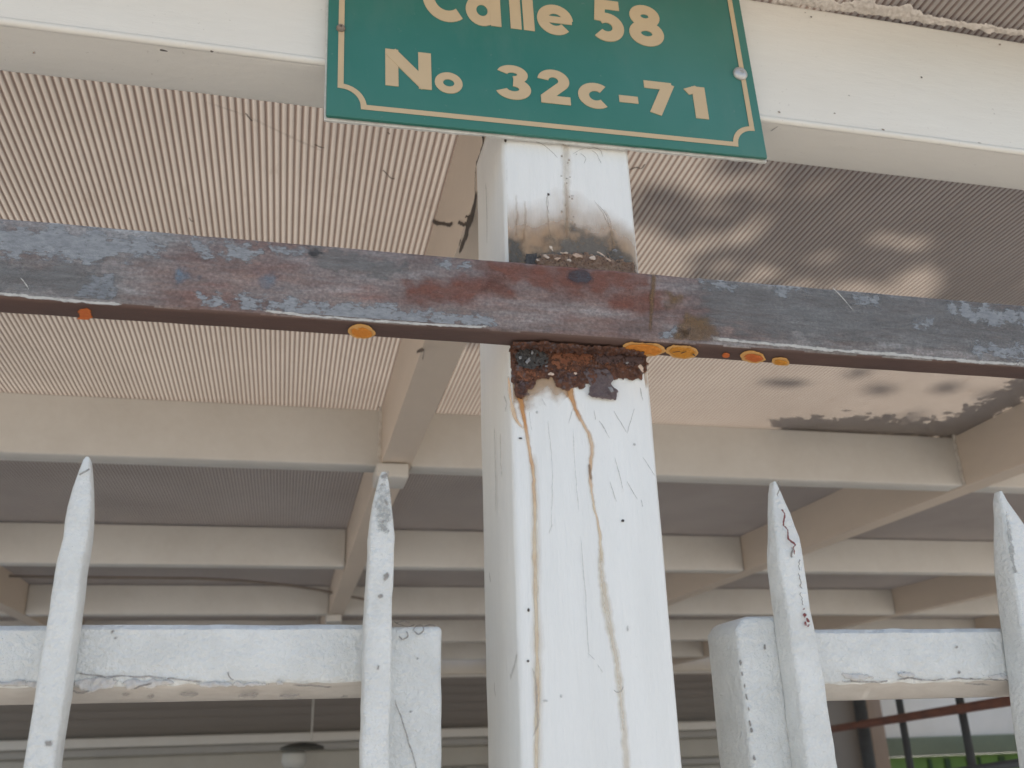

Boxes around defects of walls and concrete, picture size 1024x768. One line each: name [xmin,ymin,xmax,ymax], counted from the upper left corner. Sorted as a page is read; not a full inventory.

crack [433,136,484,253]
peeling [0,222,166,305]
peeling [190,236,407,279]
rust [77,308,93,320]
peeling [196,291,497,328]
rust [348,324,376,339]
peeling [698,278,1024,366]
rust [508,314,713,768]
spalling [74,673,283,693]